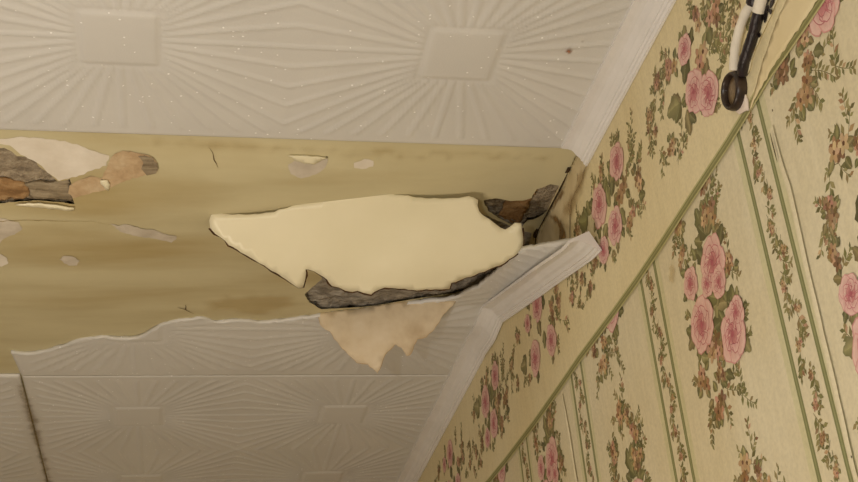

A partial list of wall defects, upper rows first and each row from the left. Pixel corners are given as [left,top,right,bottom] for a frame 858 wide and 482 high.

spalling [0,137,158,211]
peeling [111,224,177,243]
peeling [209,184,559,373]